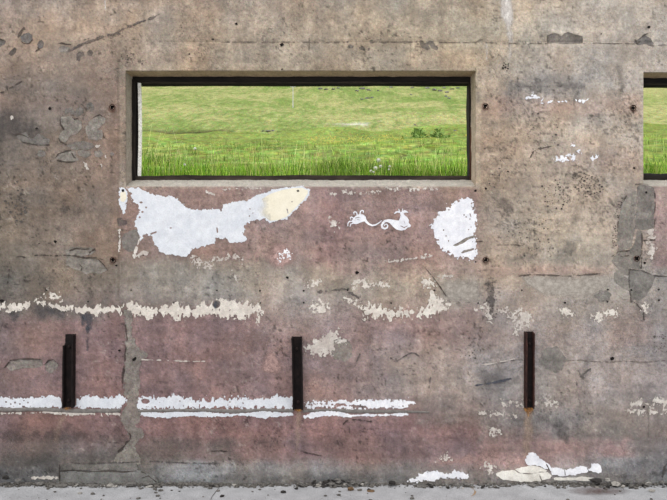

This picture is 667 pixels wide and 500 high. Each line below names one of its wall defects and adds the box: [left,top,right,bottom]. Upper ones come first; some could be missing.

peeling [119,185,310,272]
peeling [429,197,478,261]
spalling [594,184,667,314]
peeling [0,288,264,326]
peeling [343,274,453,323]
crack [121,324,129,384]
peeling [303,327,347,359]
peeling [0,394,127,417]
peeling [137,393,294,419]
peeling [303,397,416,419]
peeling [407,451,469,483]
peeling [480,452,602,482]